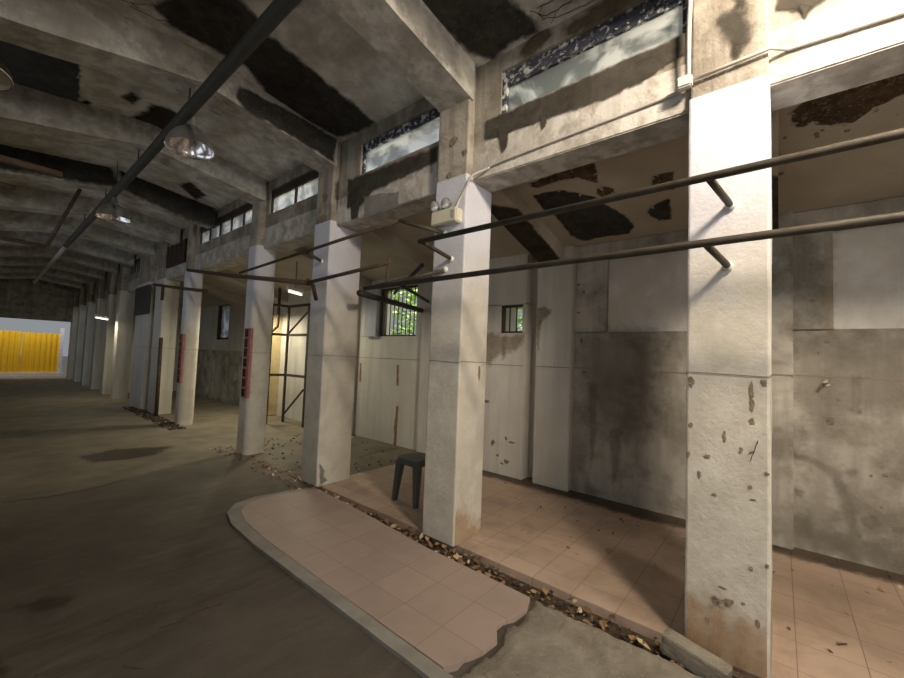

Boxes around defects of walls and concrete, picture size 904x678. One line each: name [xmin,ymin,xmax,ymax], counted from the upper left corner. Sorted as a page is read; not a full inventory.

spalling [154,0,258,56]
spalling [422,0,538,60]
crack [529,0,593,23]
damp [718,0,751,60]
spalling [0,40,82,102]
spalling [243,36,375,137]
flaking render [787,73,904,138]
spalling [528,163,634,241]
spalling [748,380,767,425]